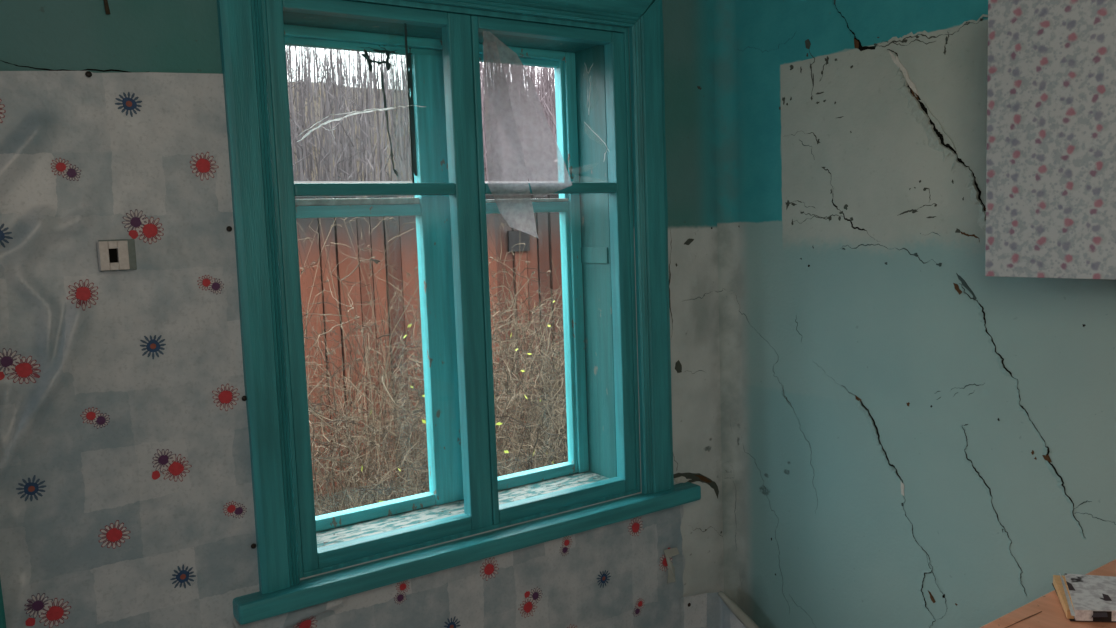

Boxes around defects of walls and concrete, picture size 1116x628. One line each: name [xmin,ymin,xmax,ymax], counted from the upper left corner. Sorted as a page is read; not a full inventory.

crack [0,60,128,73]
crack [669,232,818,513]
flaking render [779,20,988,262]
crack [817,365,958,628]
crack [785,0,1116,540]
crack [960,424,1026,596]